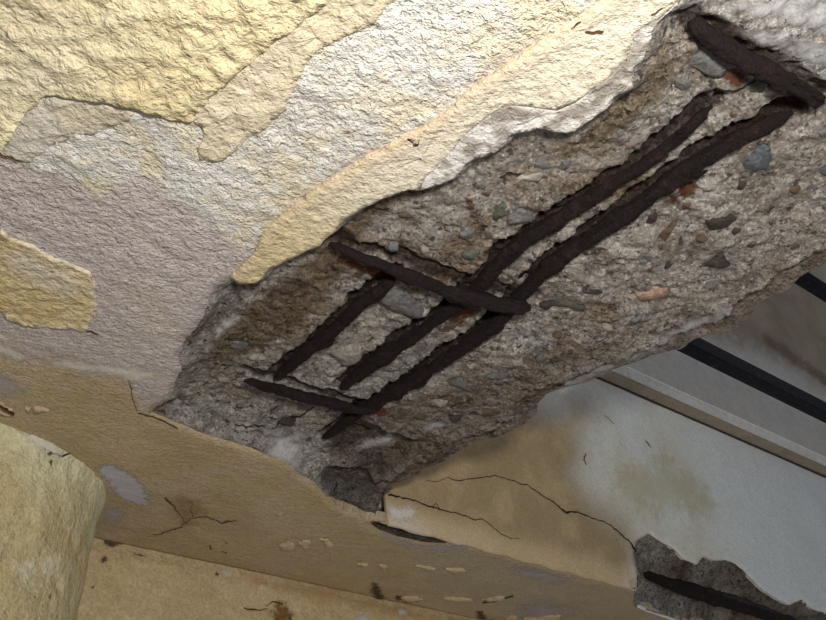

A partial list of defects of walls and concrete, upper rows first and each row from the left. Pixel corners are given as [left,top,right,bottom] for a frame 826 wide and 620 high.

peeling [0,0,396,163]
corrosion [723,70,747,87]
peeling [0,229,98,333]
spalling [152,0,826,543]
corrosion [243,105,794,439]
flaking render [98,464,150,506]
crack [153,498,237,553]
crack [388,494,520,539]
crack [426,475,637,552]
corrosion [643,571,797,620]
spalling [634,534,826,620]